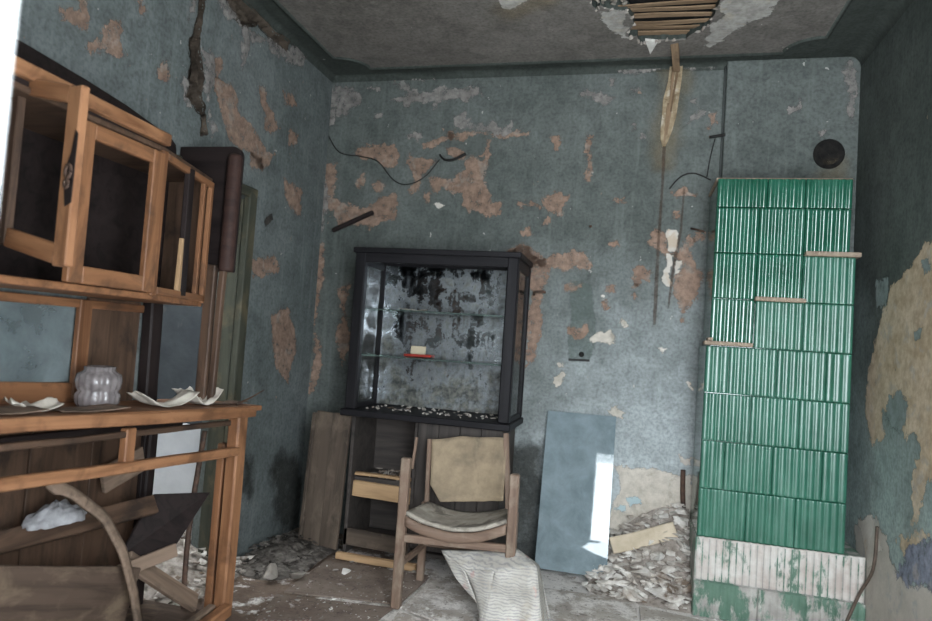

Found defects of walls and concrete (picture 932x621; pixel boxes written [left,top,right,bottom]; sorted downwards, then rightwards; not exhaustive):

crack [181,0,307,138]
peeling [214,56,299,171]
peeling [355,78,529,218]
peeling [498,0,527,9]
peeling [600,10,630,39]
spalling [660,43,683,147]
peeling [704,0,779,48]
peeling [321,162,399,231]
peeling [647,228,706,323]
peeling [567,323,615,345]
peeling [854,241,932,621]
flaking render [609,454,693,537]